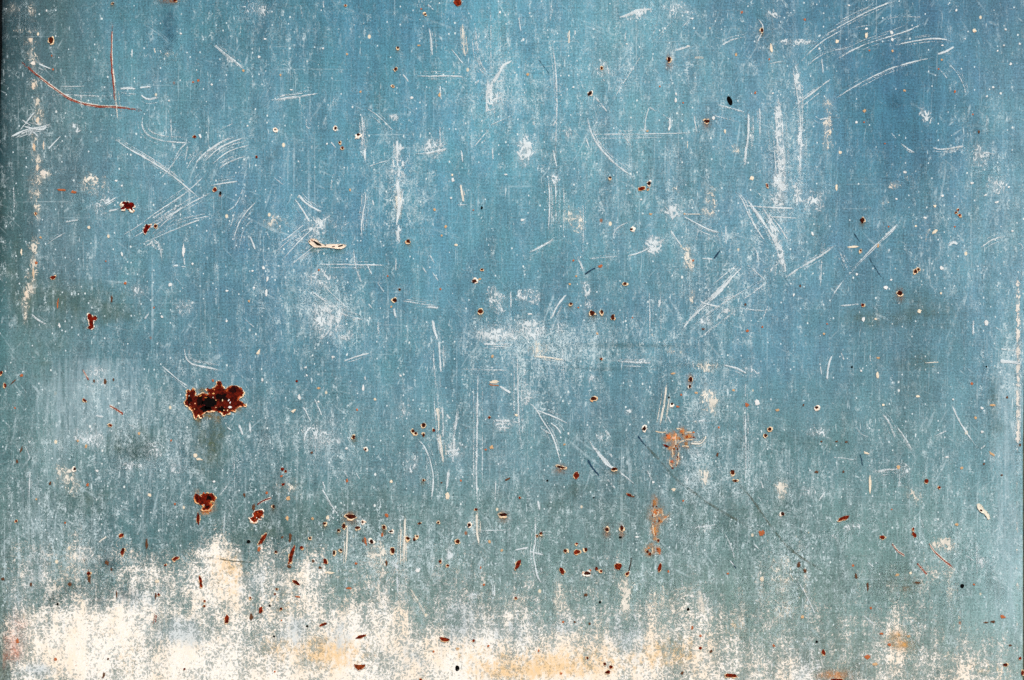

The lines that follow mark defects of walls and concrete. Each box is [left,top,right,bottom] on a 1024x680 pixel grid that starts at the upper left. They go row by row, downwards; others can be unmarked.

rust [120,201,136,213]
peeling [308,238,346,249]
rust [87,313,97,330]
rust [184,379,247,420]
rust [656,428,695,469]
rust [194,492,217,513]
rust [243,493,264,524]
rust [645,499,668,555]
peeling [3,514,1024,680]